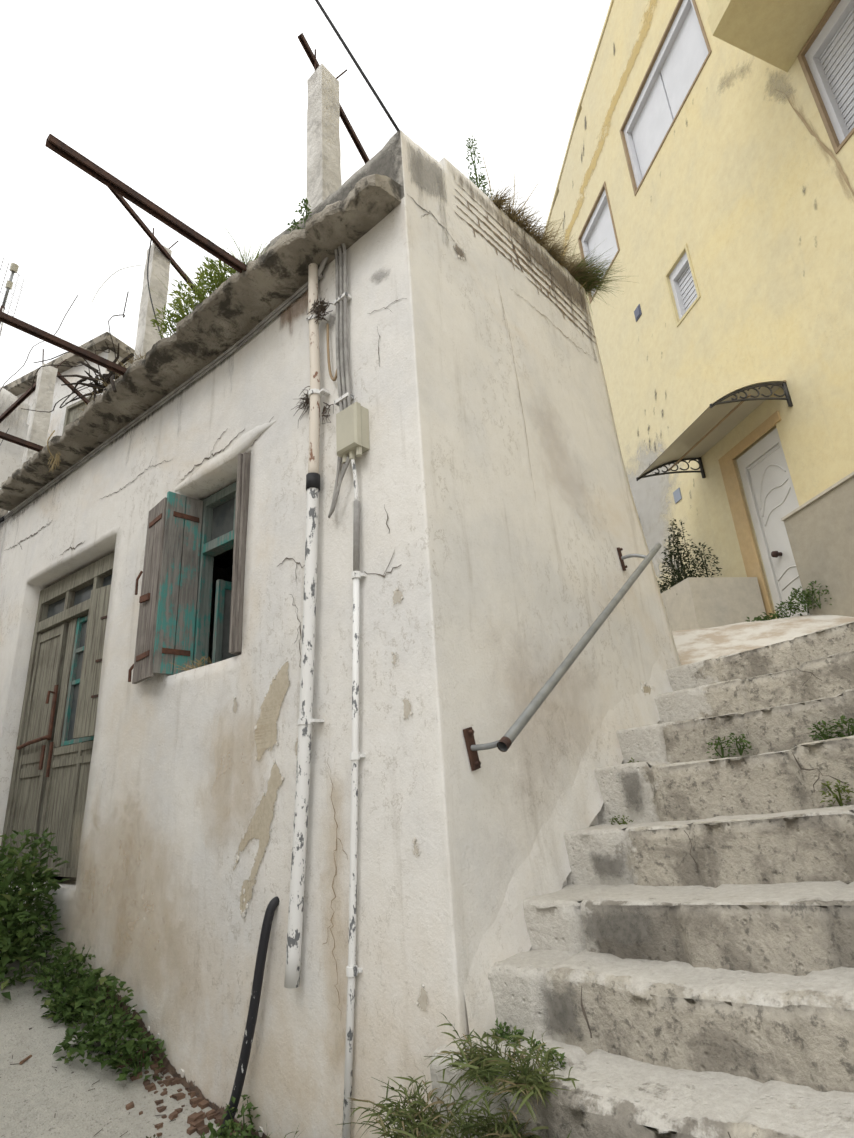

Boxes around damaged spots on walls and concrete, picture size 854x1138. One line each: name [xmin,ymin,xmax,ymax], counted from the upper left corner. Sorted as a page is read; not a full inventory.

peeling [233,662,290,918]